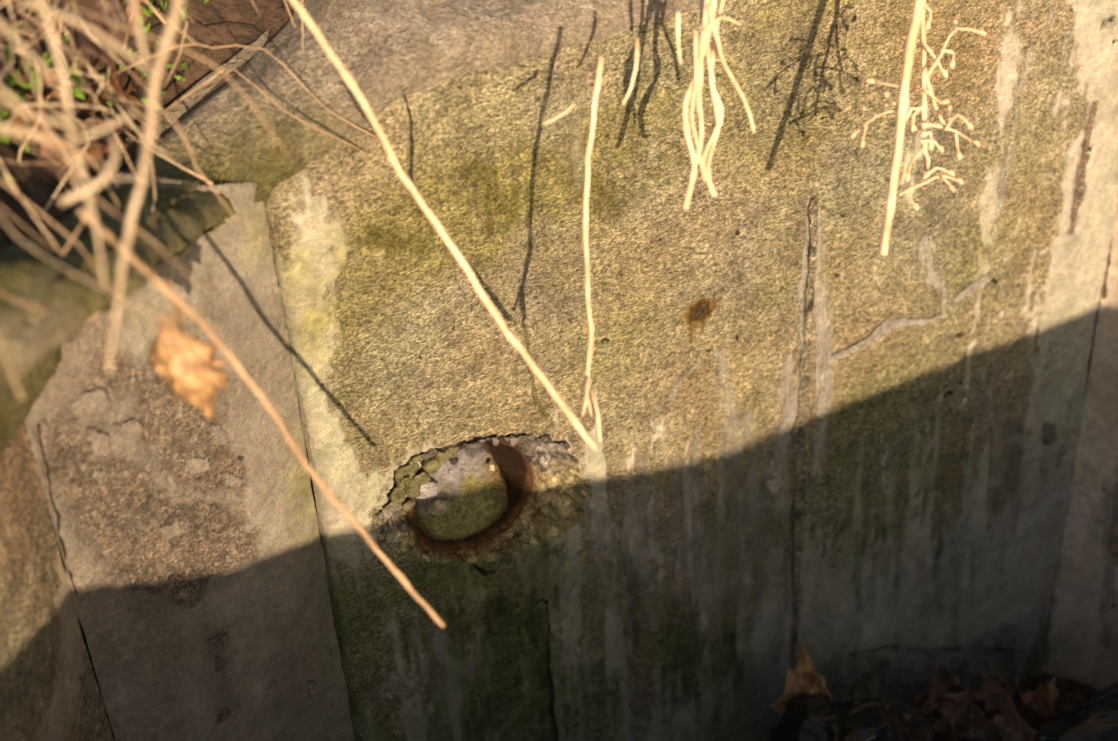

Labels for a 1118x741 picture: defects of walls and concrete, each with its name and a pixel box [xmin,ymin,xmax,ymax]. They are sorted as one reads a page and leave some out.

corrosion [682,296,720,343]
leakage [769,207,834,496]
corrosion [406,435,538,558]
spalling [373,433,589,564]